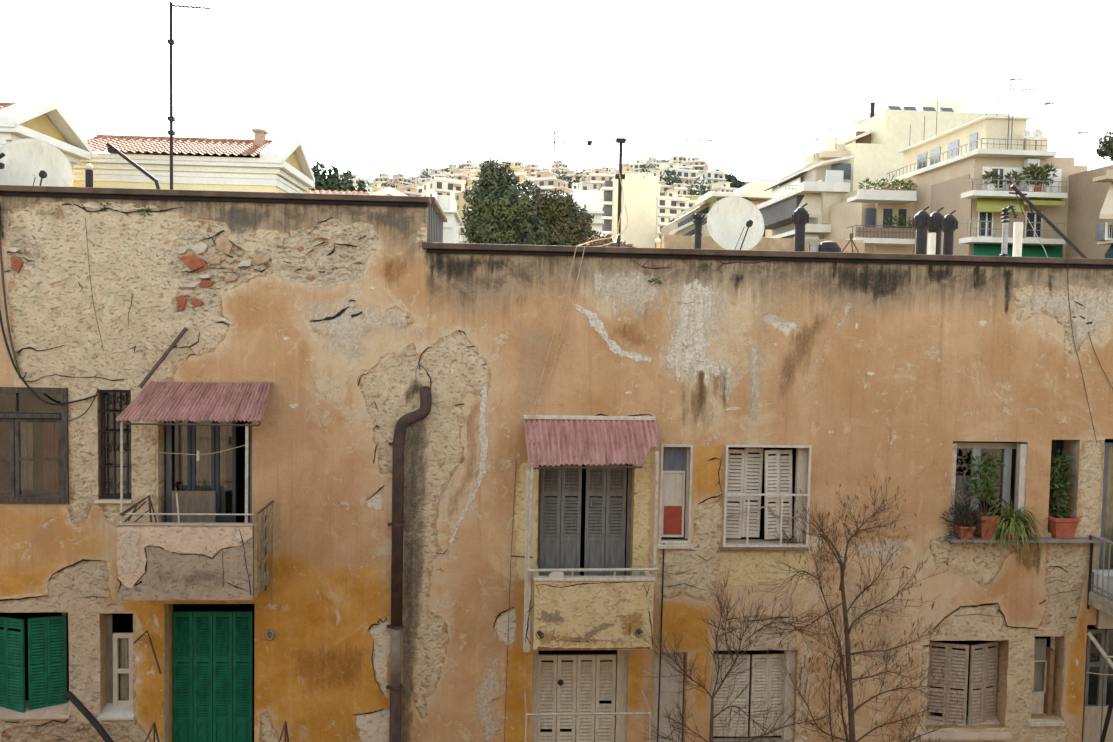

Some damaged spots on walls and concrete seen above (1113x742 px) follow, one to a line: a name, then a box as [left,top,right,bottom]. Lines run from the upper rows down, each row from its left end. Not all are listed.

flaking render [575,279,737,403]
water stain [829,262,906,341]
water stain [929,265,949,282]
flaking render [1013,284,1104,357]
crack [117,547,147,592]
flaking render [0,201,379,742]
crack [222,529,251,595]
flaking render [357,330,492,720]
flaking render [905,440,1105,742]
flaking render [354,617,390,742]